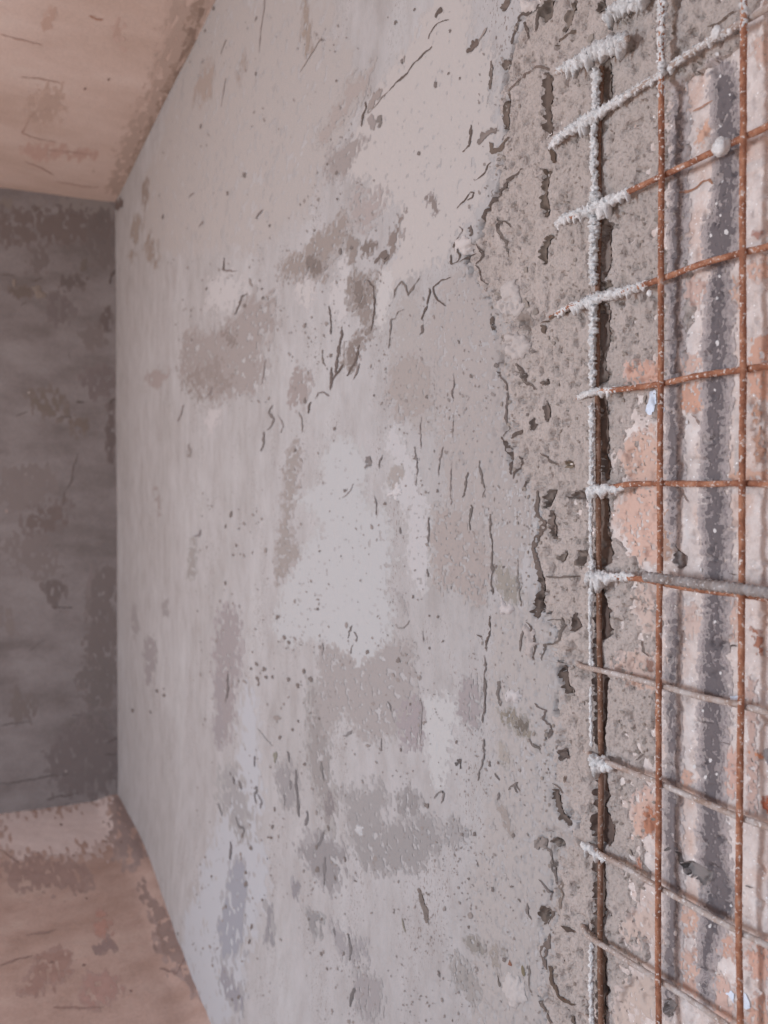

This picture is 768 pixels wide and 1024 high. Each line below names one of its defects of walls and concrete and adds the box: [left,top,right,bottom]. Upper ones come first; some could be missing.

leakage [144,55,408,413]
crack [260,127,522,451]
spalling [477,93,511,145]
crack [414,363,580,800]
spalling [529,575,547,618]
crack [525,845,575,1024]
spalling [534,0,768,1024]
leakage [661,590,744,1021]
leakage [663,55,747,583]
corrosion [744,674,768,816]
corrosion [749,403,766,464]
corrosion [749,626,768,656]